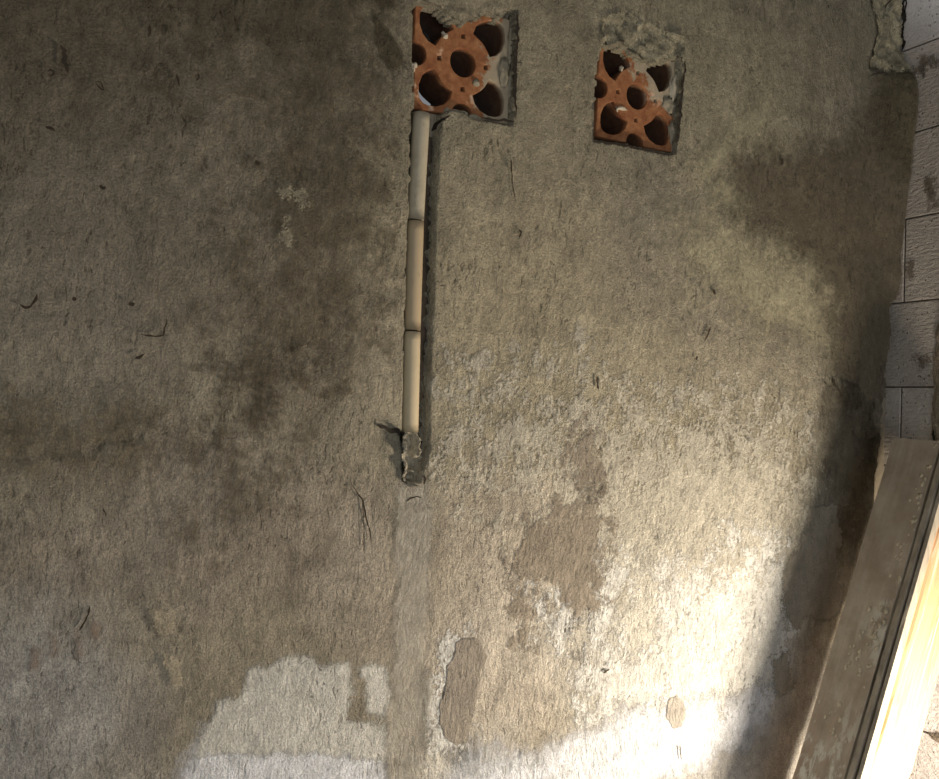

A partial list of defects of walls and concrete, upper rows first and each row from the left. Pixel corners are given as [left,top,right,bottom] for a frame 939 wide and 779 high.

spalling [870,0,914,75]
damp [681,94,911,629]
damp [182,743,388,779]
damp [452,652,796,779]